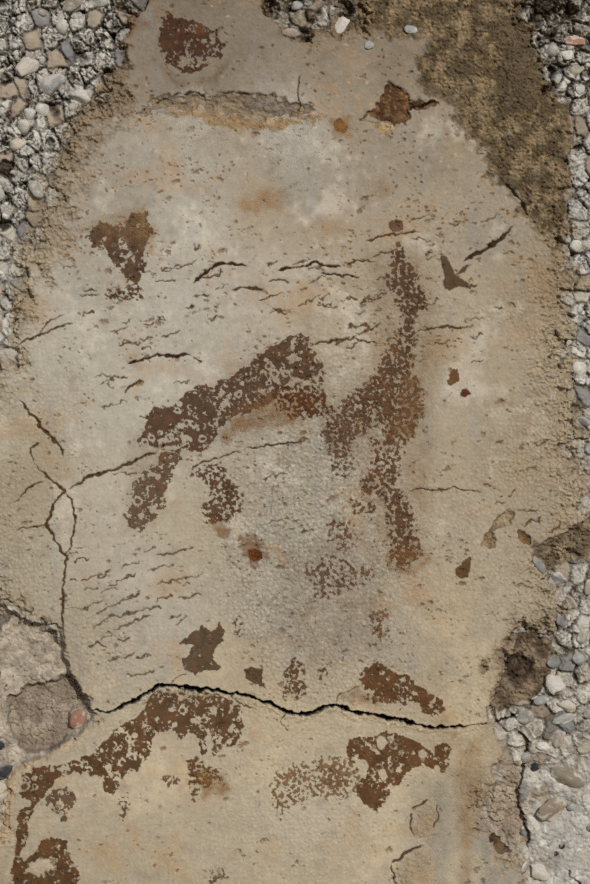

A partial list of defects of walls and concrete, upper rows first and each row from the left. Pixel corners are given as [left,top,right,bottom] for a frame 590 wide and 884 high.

spalling [350,0,572,237]
crack [464,183,528,261]
crack [20,214,461,409]
crack [399,297,502,345]
rust [123,219,426,599]
spalling [0,605,96,768]
rust [179,616,243,675]
crack [18,401,465,733]
rust [359,662,446,716]
spalling [490,631,558,712]
rust [10,689,244,884]
rust [269,731,452,820]